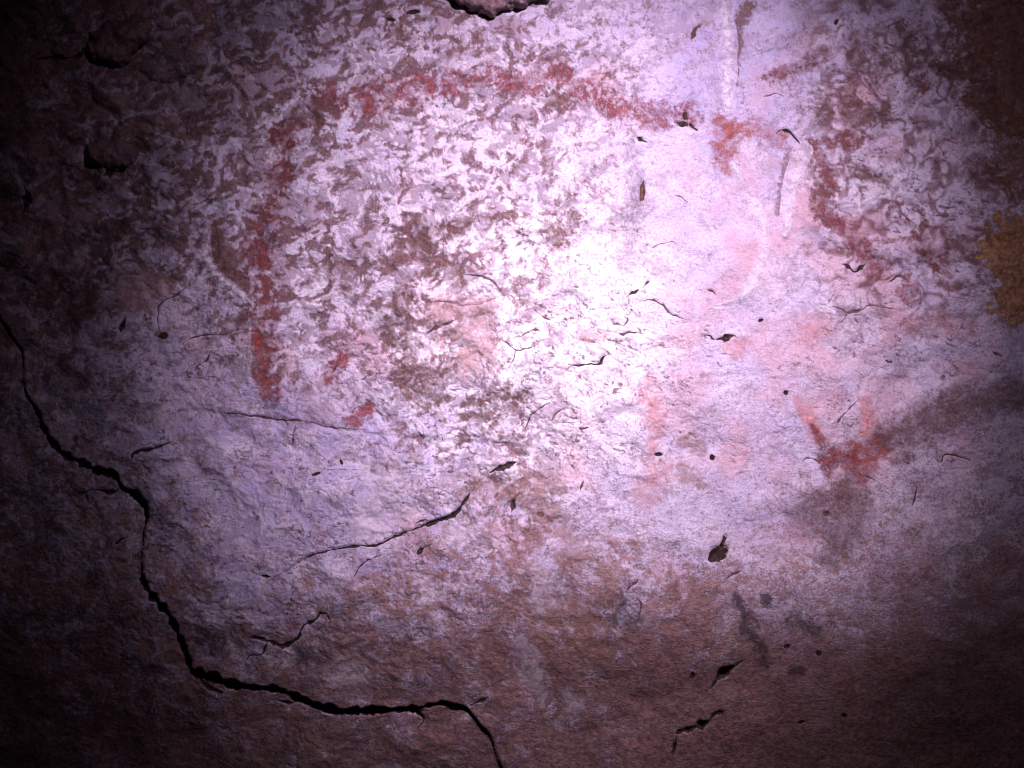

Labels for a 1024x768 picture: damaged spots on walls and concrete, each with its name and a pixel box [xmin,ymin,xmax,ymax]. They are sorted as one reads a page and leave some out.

crack [118,315,126,332]
crack [0,318,517,768]